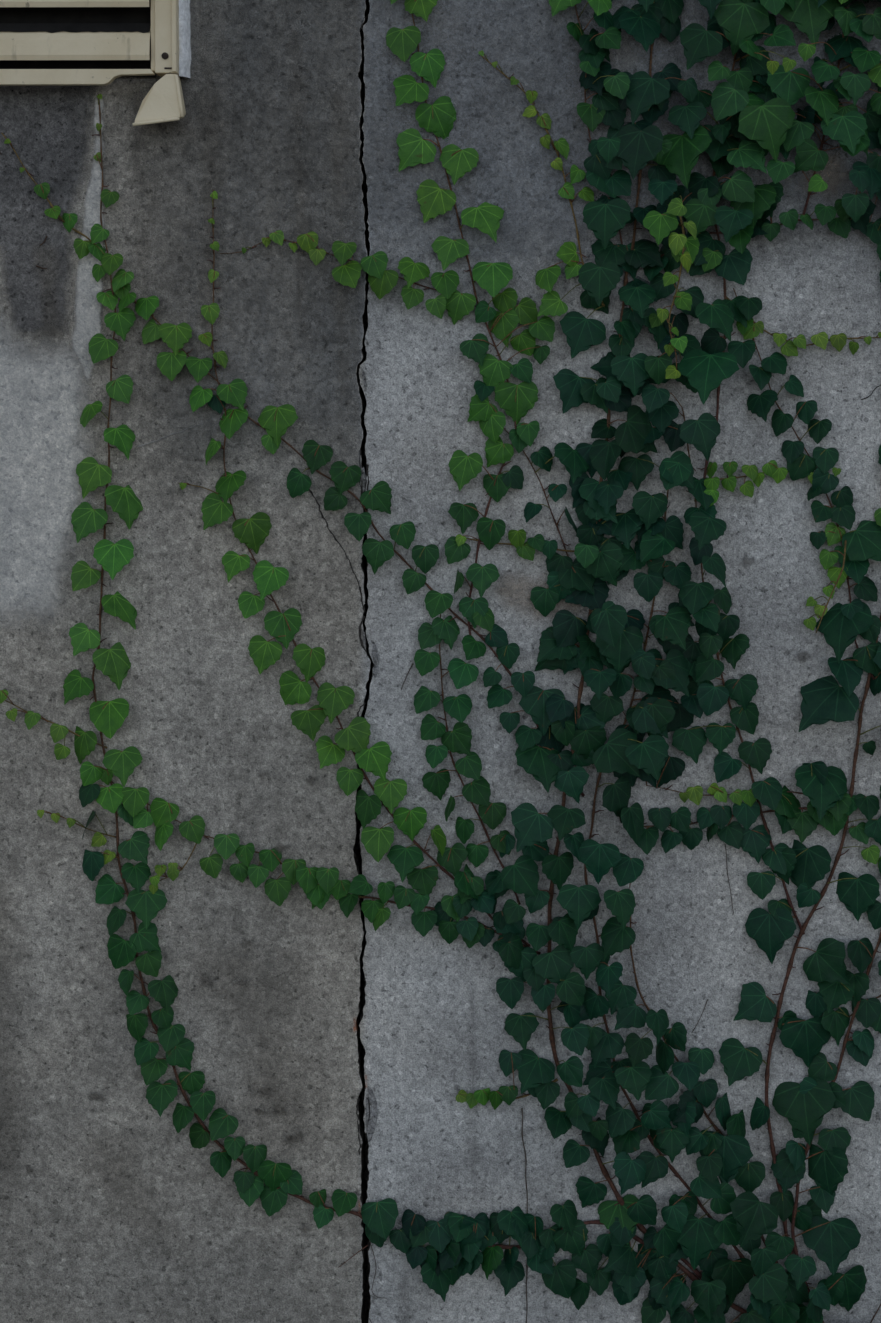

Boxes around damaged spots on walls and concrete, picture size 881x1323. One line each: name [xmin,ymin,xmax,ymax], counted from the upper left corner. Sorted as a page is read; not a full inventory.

crack [309,0,374,718]
crack [353,764,371,1323]